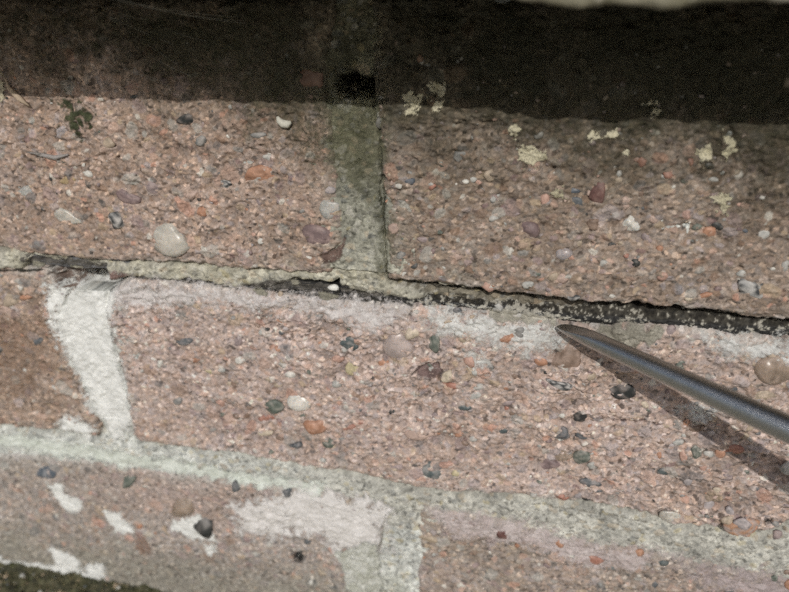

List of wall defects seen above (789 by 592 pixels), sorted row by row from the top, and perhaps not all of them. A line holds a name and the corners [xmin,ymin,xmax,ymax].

crack [375,104,389,277]
crack [133,276,238,290]
crack [420,281,524,294]
crack [263,289,413,306]
crack [631,303,789,321]